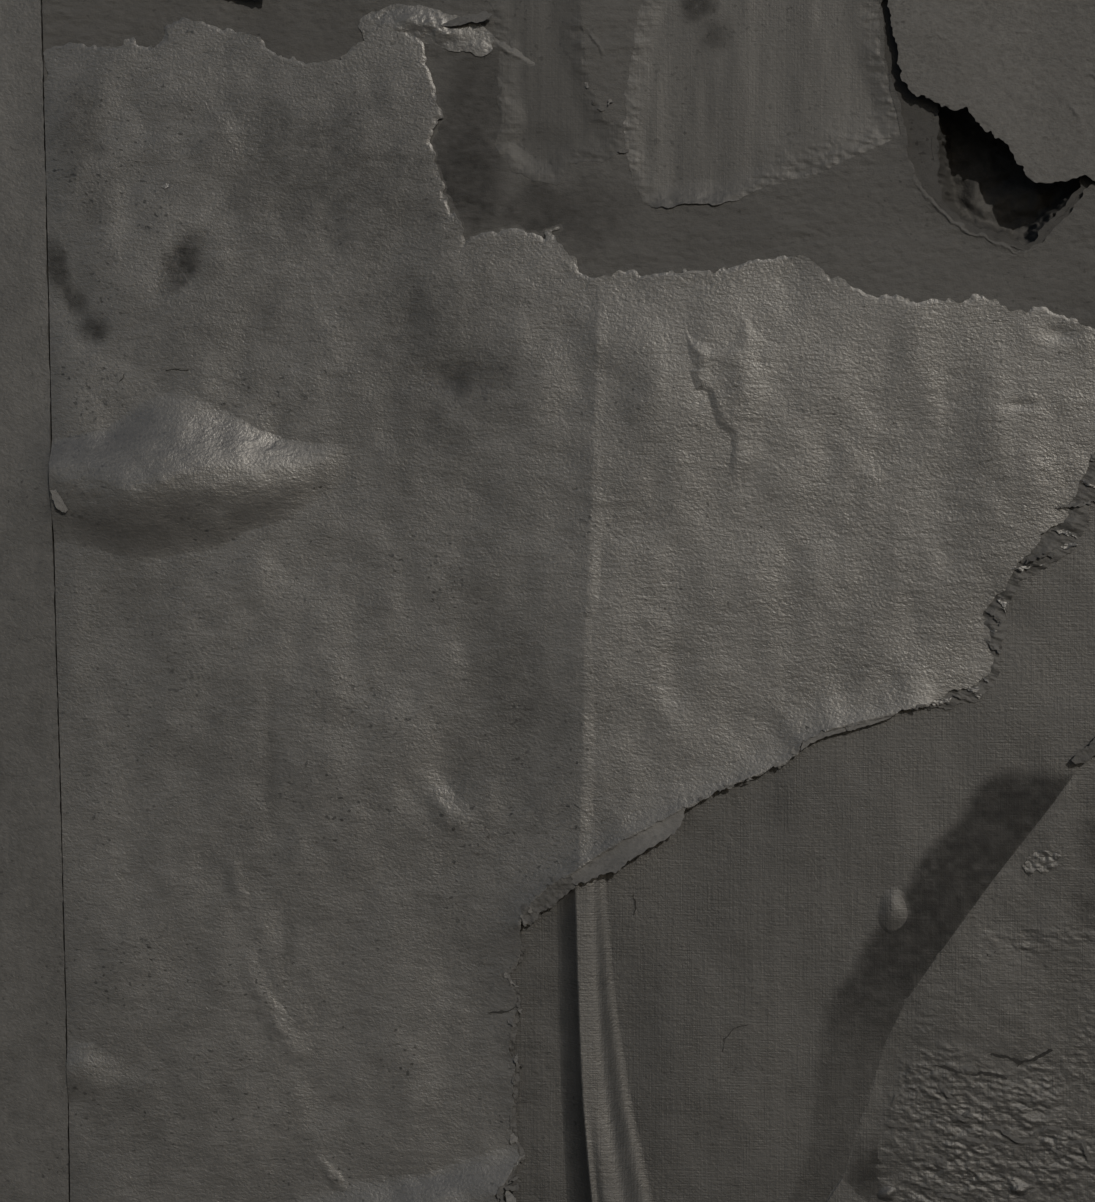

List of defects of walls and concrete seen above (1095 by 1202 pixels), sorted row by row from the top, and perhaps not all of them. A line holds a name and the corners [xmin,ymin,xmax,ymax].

peeling [358,4,535,66]
peeling [1022,850,1061,876]
peeling [827,903,1095,1202]